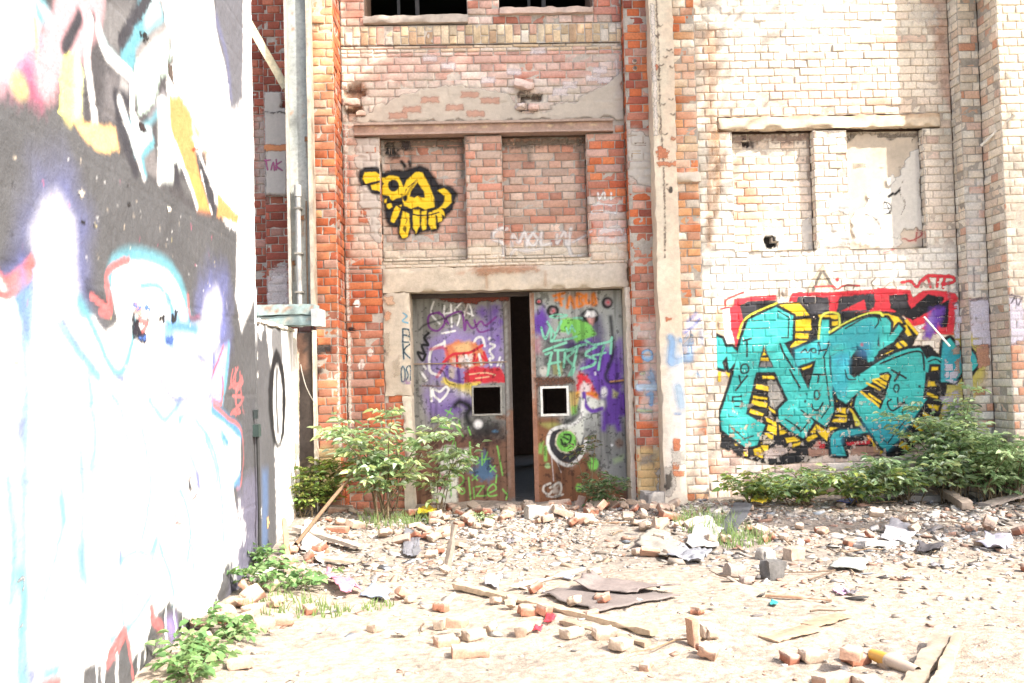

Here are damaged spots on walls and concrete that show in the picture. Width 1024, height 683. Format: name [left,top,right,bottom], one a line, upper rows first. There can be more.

spalling [345,85,366,117]
flaking render [389,92,499,119]
spalling [514,78,541,111]
flaking render [632,133,676,167]
flaking render [800,149,927,250]